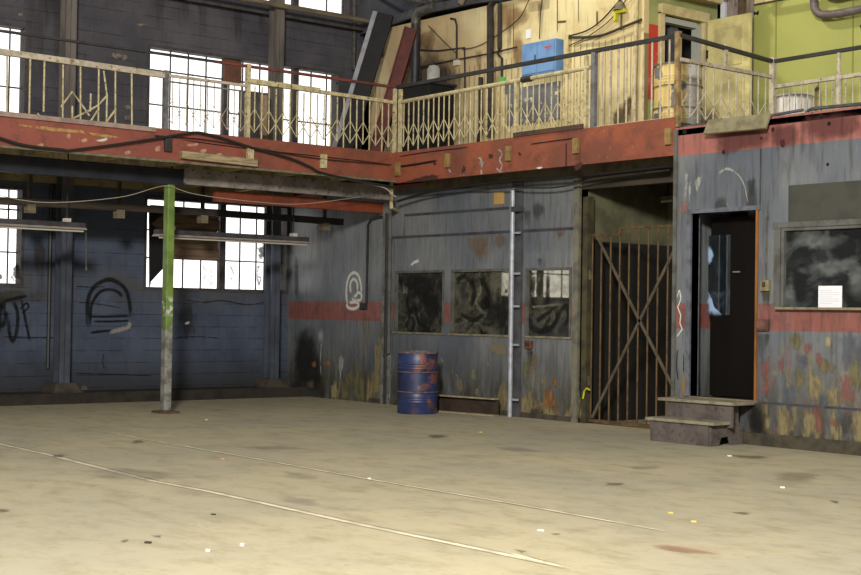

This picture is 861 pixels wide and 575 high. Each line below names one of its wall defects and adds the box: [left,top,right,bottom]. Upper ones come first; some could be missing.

peeling [762,405,790,435]
peeling [789,332,861,442]